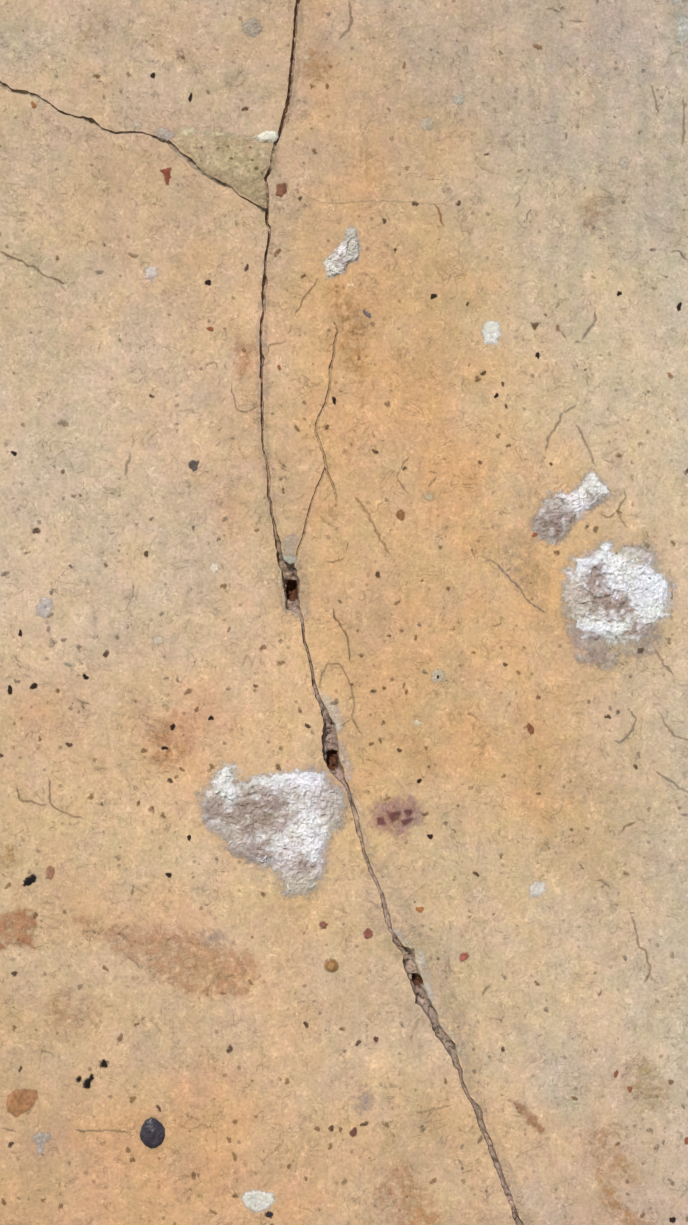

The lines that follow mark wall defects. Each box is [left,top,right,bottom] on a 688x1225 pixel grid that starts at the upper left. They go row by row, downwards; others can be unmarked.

crack [0,0,529,1225]
crack [490,559,544,612]